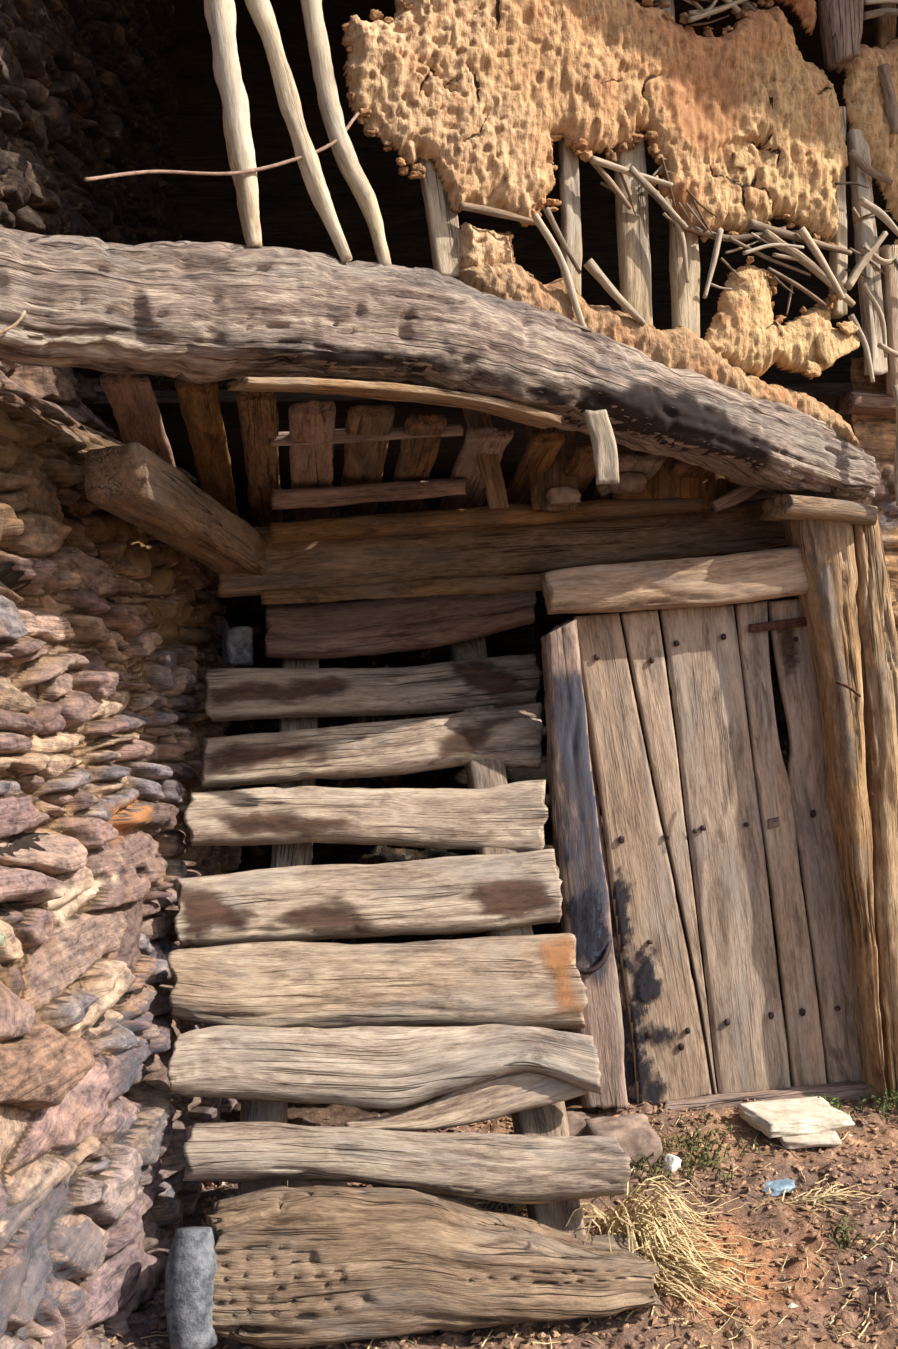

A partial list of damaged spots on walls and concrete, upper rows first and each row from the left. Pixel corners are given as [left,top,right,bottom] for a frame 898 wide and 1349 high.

spalling [642,0,774,37]
spalling [536,198,562,217]
spalling [550,126,838,272]
crack [707,83,781,214]
peeling [765,271,861,377]
leakage [542,673,677,1105]